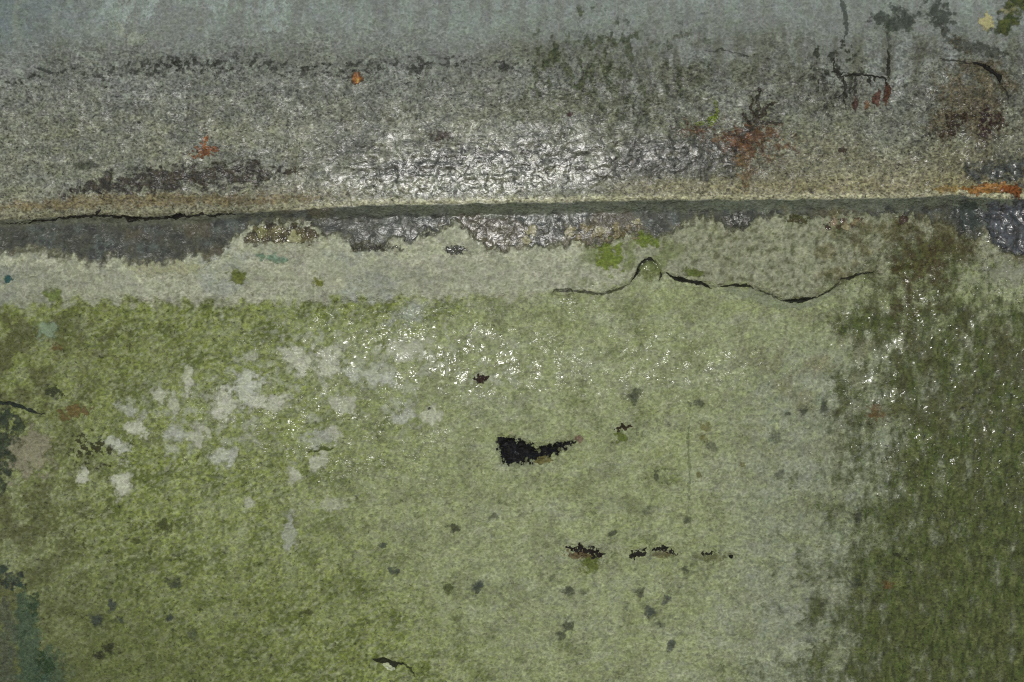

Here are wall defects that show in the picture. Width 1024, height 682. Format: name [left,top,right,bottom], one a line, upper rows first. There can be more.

rust [852,82,891,111]
rust [681,117,796,166]
water stain [62,158,302,199]
rust [933,181,1022,200]
spalling [244,222,319,247]
spalling [951,197,1024,255]
crack [631,257,754,289]
crack [840,271,874,280]
water stain [887,214,972,333]
crack [783,296,817,304]
spalling [564,543,605,574]
spalling [629,545,678,560]